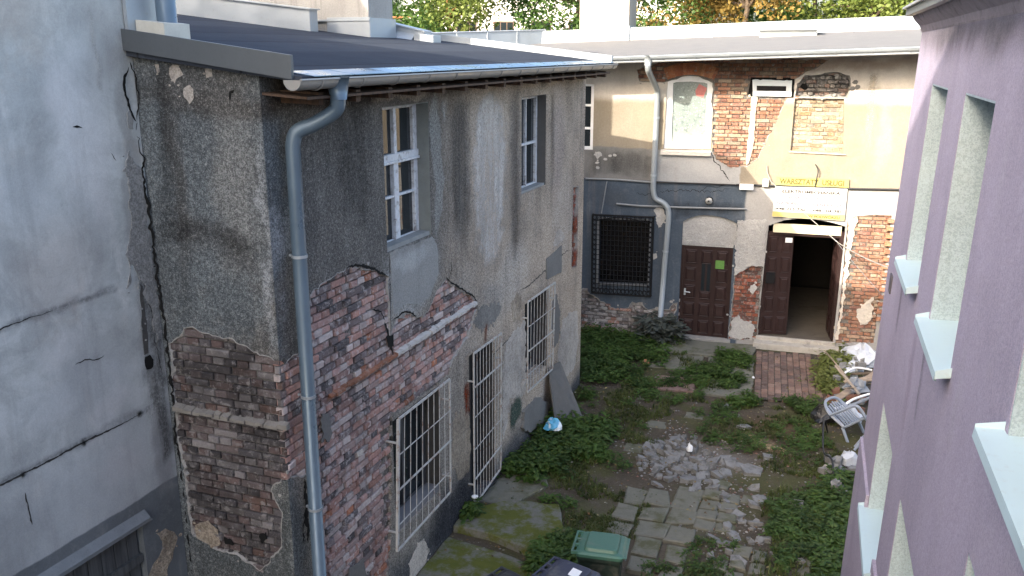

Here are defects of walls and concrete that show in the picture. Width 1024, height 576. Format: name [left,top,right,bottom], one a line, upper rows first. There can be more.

flaking render [155,64,194,104]
flaking render [637,58,860,169]
damp [475,96,504,260]
crack [0,310,54,330]
crack [0,411,142,523]
crack [111,62,192,571]
flaking render [123,151,306,576]
flaking render [310,262,502,576]
flaking render [551,288,682,376]
flaking render [726,219,767,341]
flaking render [833,214,892,344]